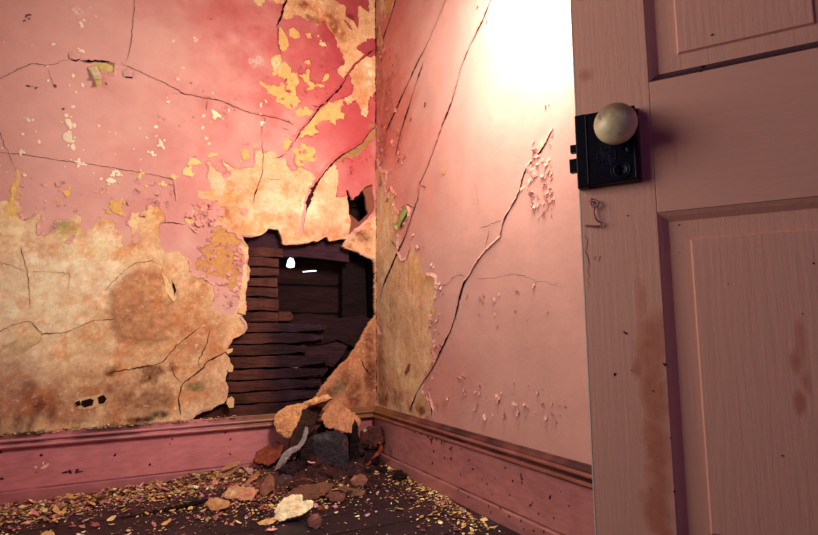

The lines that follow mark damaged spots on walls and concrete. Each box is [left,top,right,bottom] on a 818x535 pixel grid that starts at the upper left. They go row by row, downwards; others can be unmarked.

crack [1,249,114,347]
crack [104,328,225,416]
crack [0,0,445,235]
flaking render [0,0,566,436]
crack [361,0,491,399]
crack [409,126,555,419]